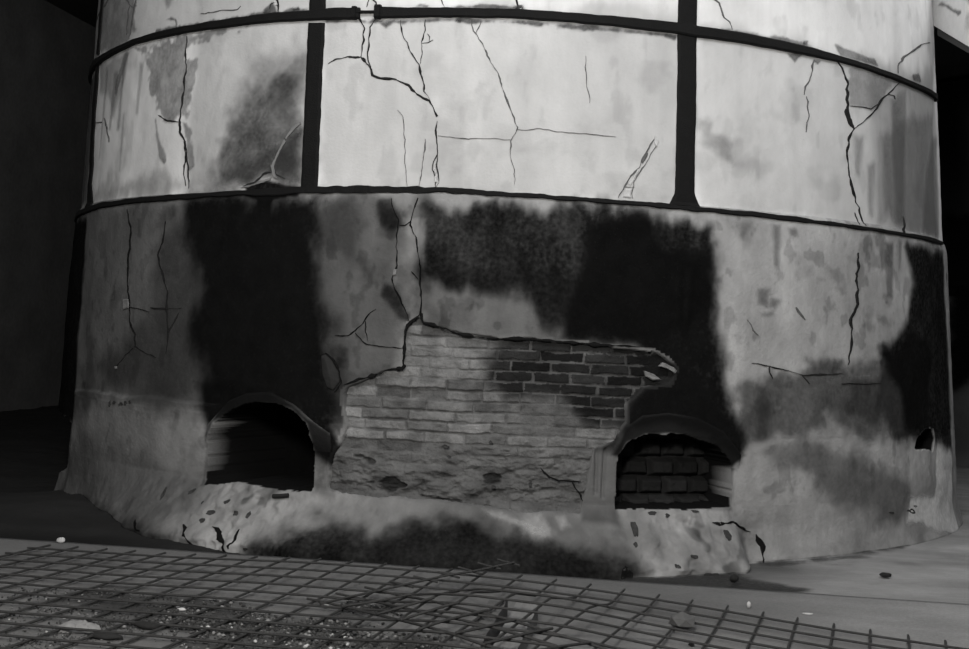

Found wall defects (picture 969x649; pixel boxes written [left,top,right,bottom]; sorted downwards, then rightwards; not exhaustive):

crack [158,36,190,188]
damp [221,74,302,184]
crack [328,0,637,385]
crack [618,137,658,198]
crack [804,61,814,132]
crack [837,42,930,226]
crack [114,209,181,369]
crack [755,253,878,385]
flaking render [330,318,677,514]